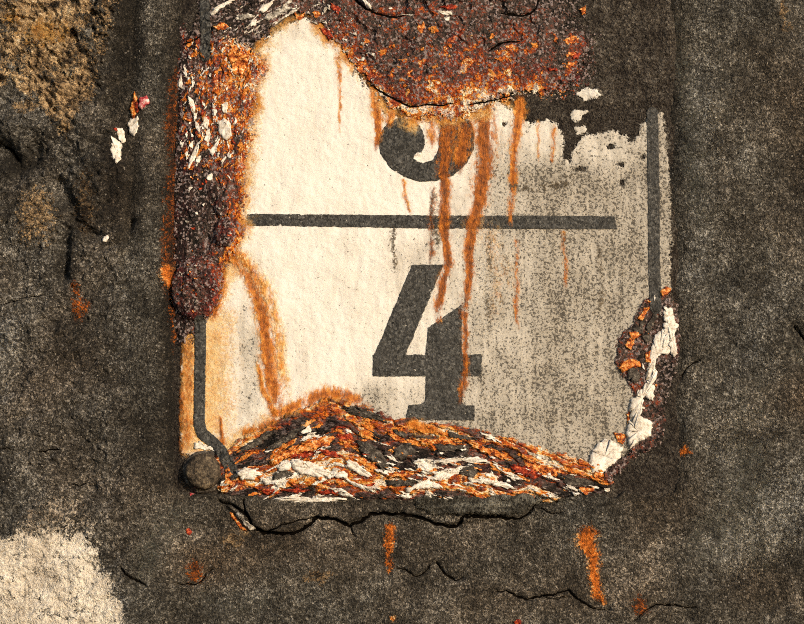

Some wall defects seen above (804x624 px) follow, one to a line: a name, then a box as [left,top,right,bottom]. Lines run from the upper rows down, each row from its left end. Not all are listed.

rust [160,0,614,503]
peeling [587,286,681,482]
rust [383,523,396,573]
crack [220,500,562,536]
rust [576,525,607,606]